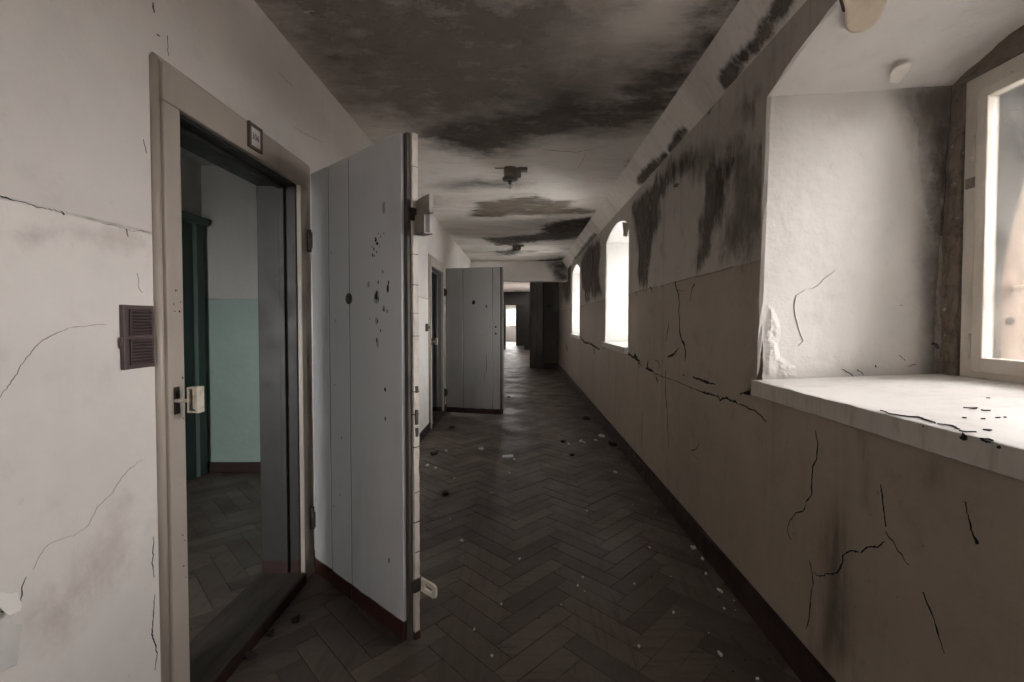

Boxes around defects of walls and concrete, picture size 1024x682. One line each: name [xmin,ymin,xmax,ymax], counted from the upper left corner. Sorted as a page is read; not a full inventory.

water stain [719,0,793,89]
crack [0,195,66,215]
water stain [471,196,601,301]
water stain [632,128,694,288]
water stain [697,154,761,270]
water stain [906,88,948,334]
crack [0,324,106,397]
crack [566,281,766,455]
flaking render [739,303,798,397]
crack [794,270,835,346]
crack [880,397,1007,441]
crack [805,484,909,628]